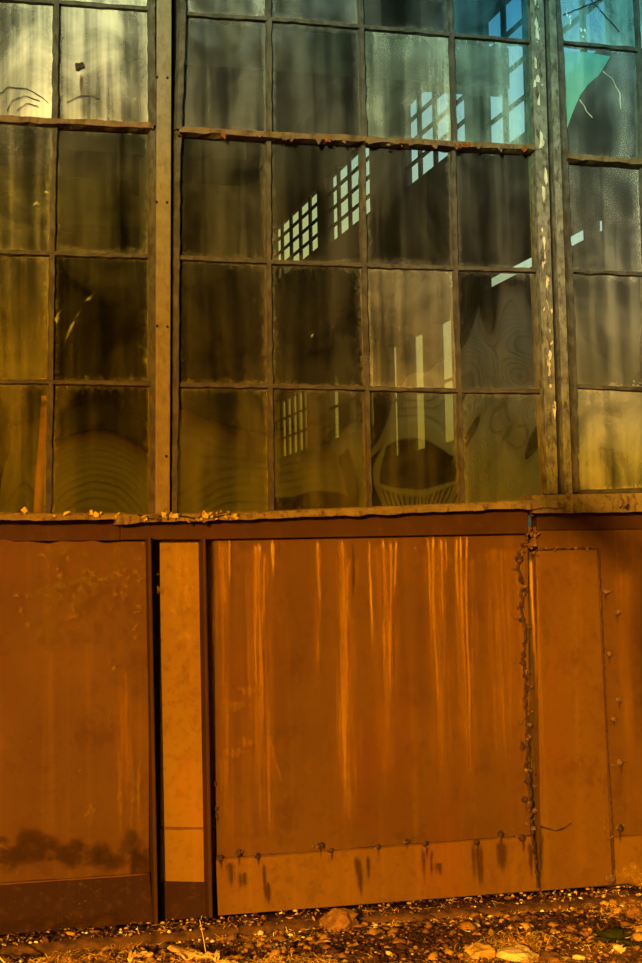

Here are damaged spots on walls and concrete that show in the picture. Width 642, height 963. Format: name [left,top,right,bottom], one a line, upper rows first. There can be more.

corrosion [220,541,231,635]
corrosion [248,541,274,815]
corrosion [340,542,354,783]
corrosion [368,541,397,727]
corrosion [427,537,471,734]
corrosion [497,513,627,888]
damp [0,831,150,874]